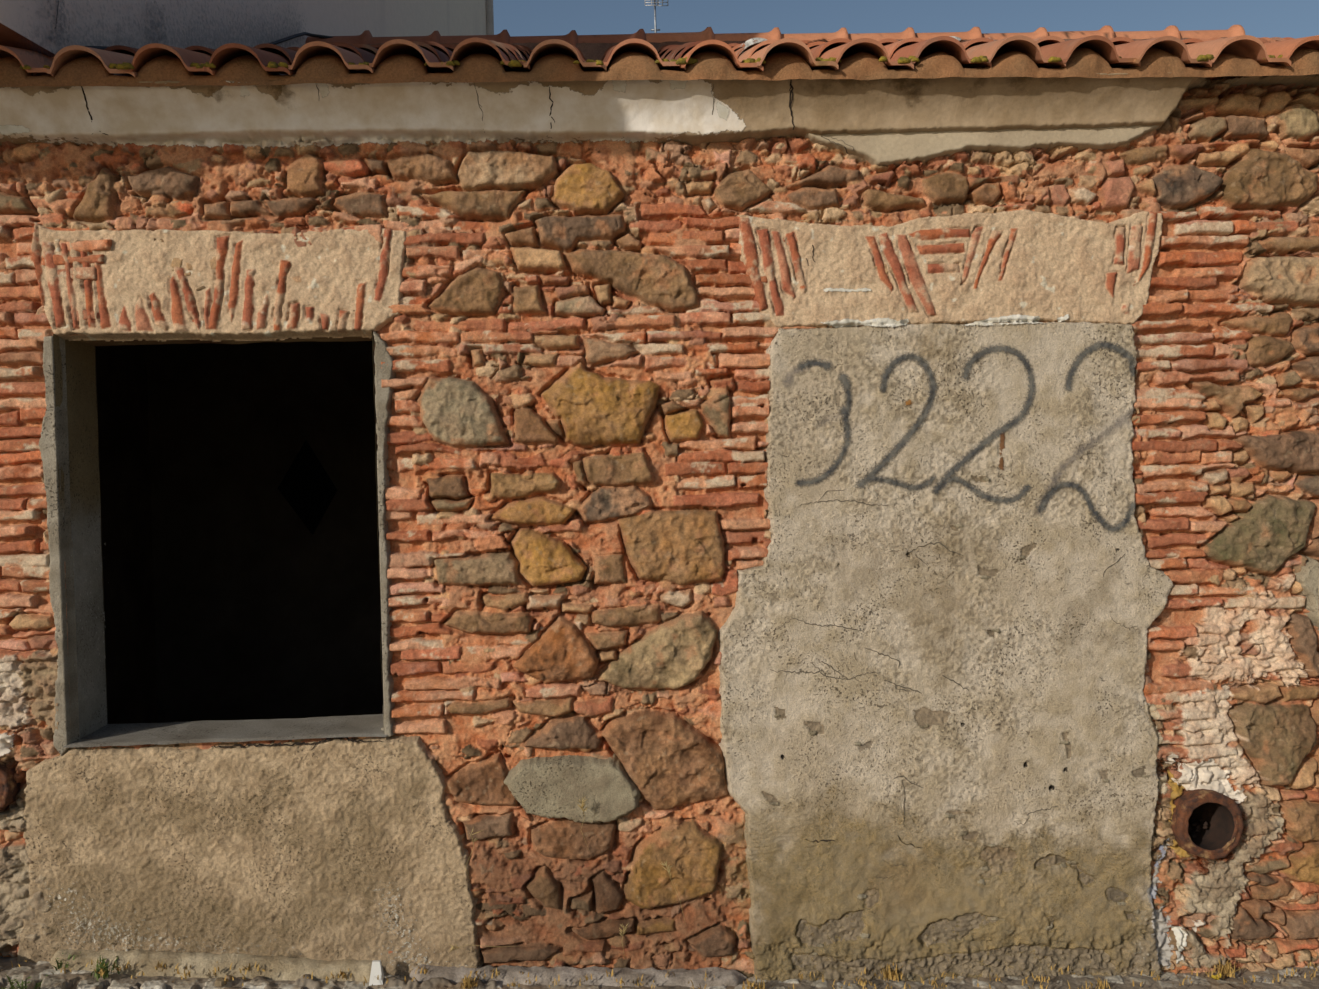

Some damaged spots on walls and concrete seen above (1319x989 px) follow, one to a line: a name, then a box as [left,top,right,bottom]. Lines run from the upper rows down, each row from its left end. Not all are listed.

peeling [0,79,746,149]
crack [548,87,556,129]
crack [789,79,854,154]
corrosion [1196,787,1247,875]